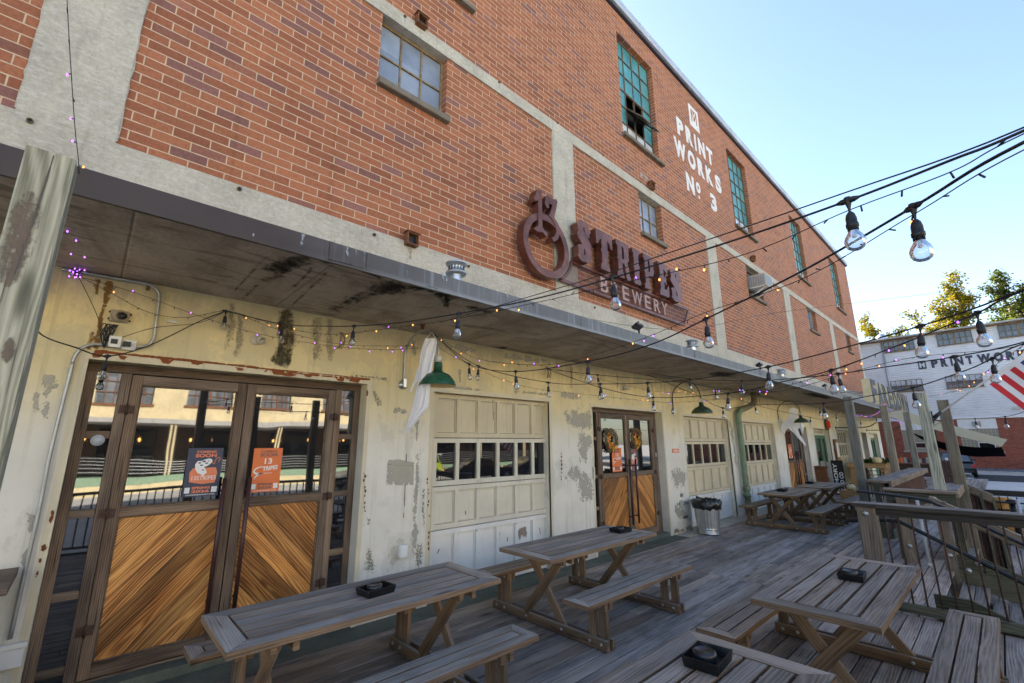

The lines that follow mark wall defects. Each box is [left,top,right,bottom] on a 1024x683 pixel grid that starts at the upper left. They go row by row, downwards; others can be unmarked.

damp [261,234,308,280]
damp [320,247,455,307]
corrosion [87,279,113,349]
damp [271,309,294,366]
peeling [33,375,58,419]
peeling [561,392,594,502]
spalling [387,454,419,548]